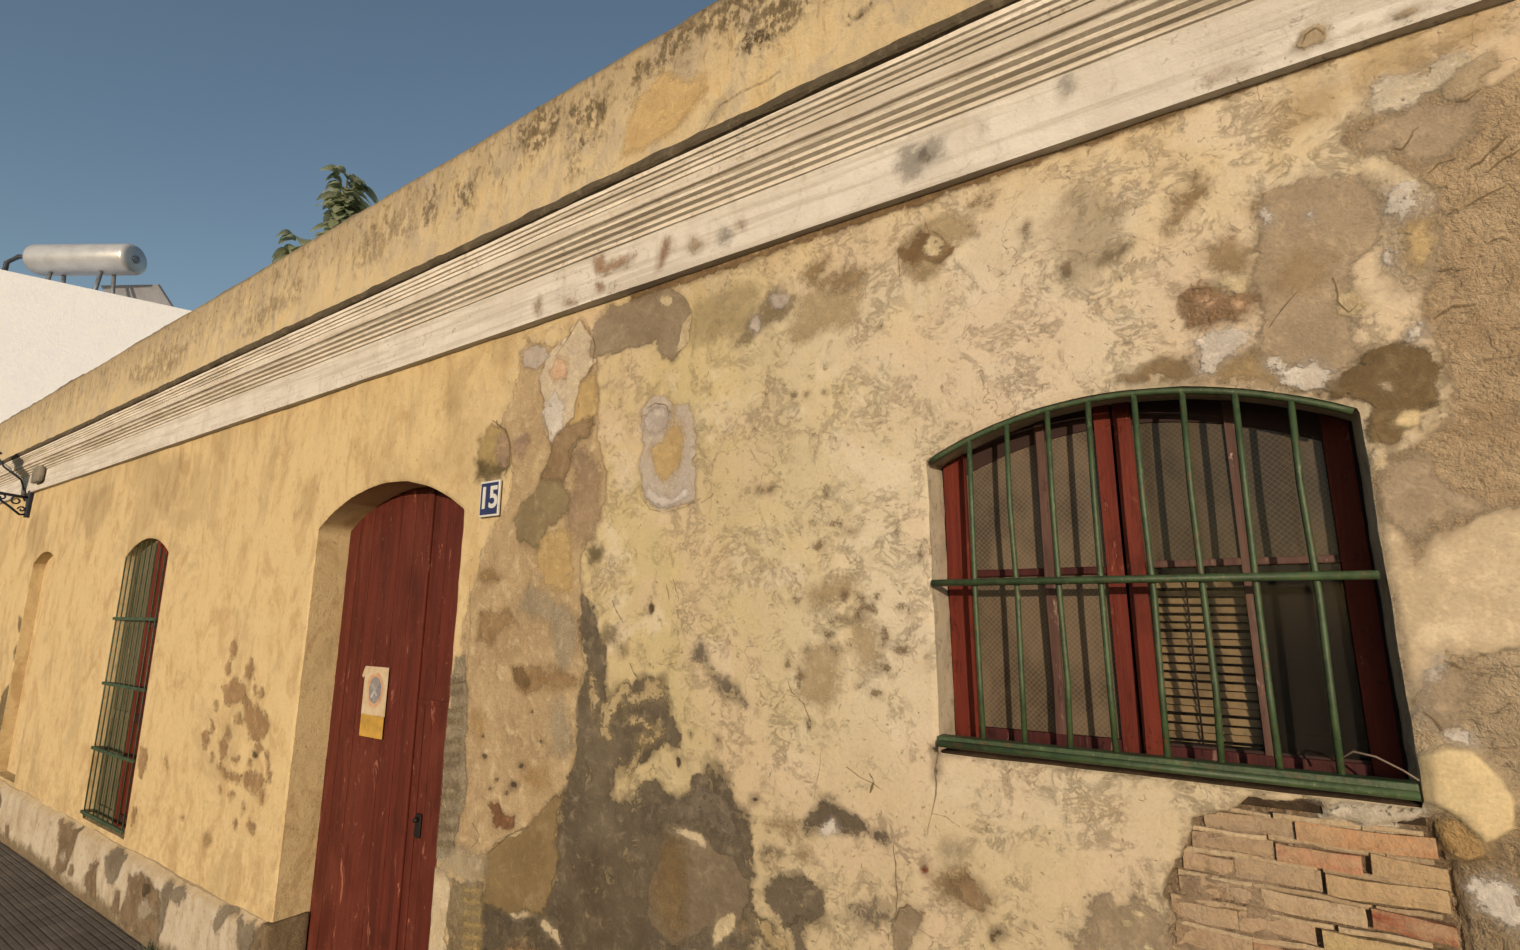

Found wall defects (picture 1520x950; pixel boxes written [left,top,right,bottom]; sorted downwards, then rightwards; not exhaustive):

peeling [1294,23,1327,49]
flaking render [897,194,992,280]
flaking render [1177,172,1386,391]
flaking render [1341,51,1520,558]
peeling [638,395,714,512]
flaking render [428,322,608,950]
peeling [201,640,271,834]
leakage [0,835,169,950]
peeling [677,828,706,848]
peeling [712,912,736,947]
flaking render [766,801,890,857]
flaking render [1065,648,1520,950]